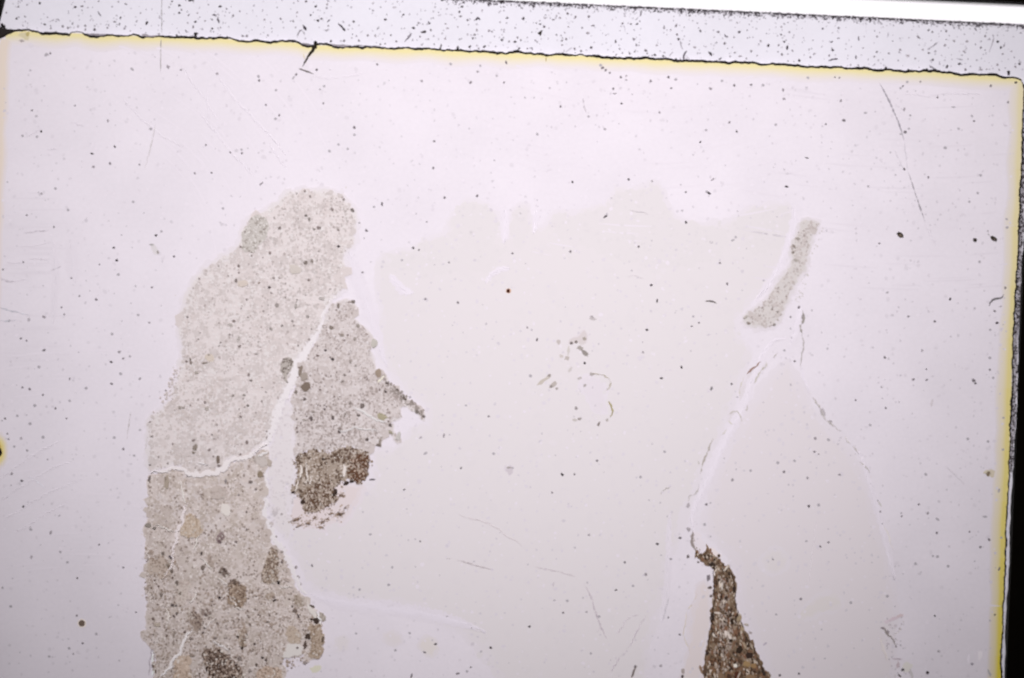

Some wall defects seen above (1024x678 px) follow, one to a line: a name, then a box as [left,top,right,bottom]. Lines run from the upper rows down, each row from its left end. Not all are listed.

crack [299,43,318,74]
crack [127,297,336,626]
peeling [288,492,349,530]
crack [148,607,230,677]